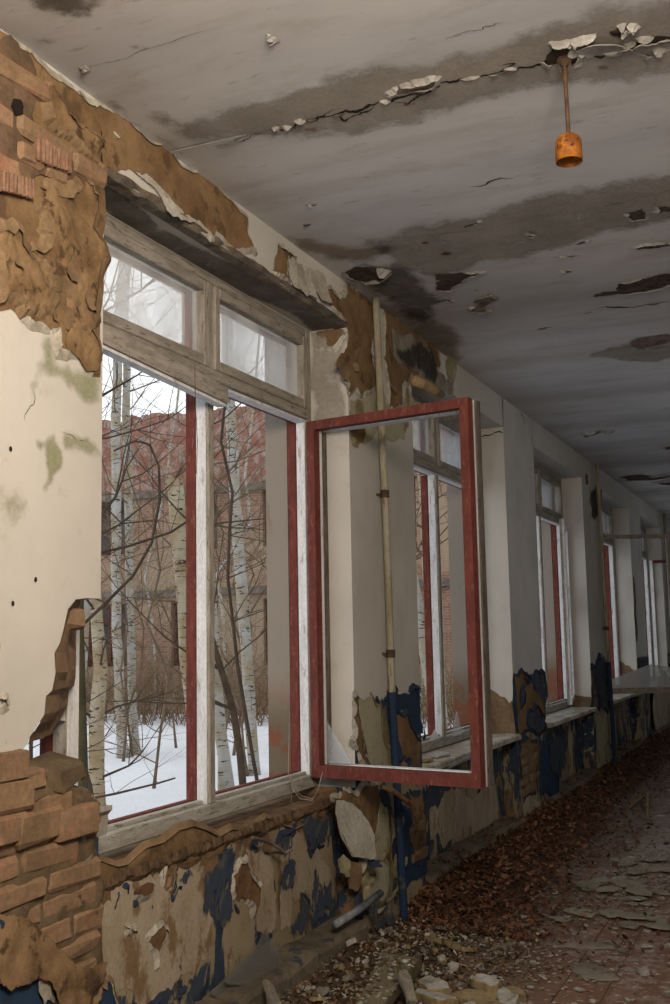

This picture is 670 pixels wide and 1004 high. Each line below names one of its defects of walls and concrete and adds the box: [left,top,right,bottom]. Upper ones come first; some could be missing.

damp [37,0,92,12]
crack [578,39,670,59]
crack [218,62,545,146]
flaking render [0,30,457,409]
spalling [623,206,670,222]
spalling [594,274,670,297]
spalling [630,334,670,350]
spalling [618,473,670,485]
spalling [28,598,87,744]
peeling [620,661,634,675]
peeling [568,668,611,776]
flaking render [0,766,498,1004]